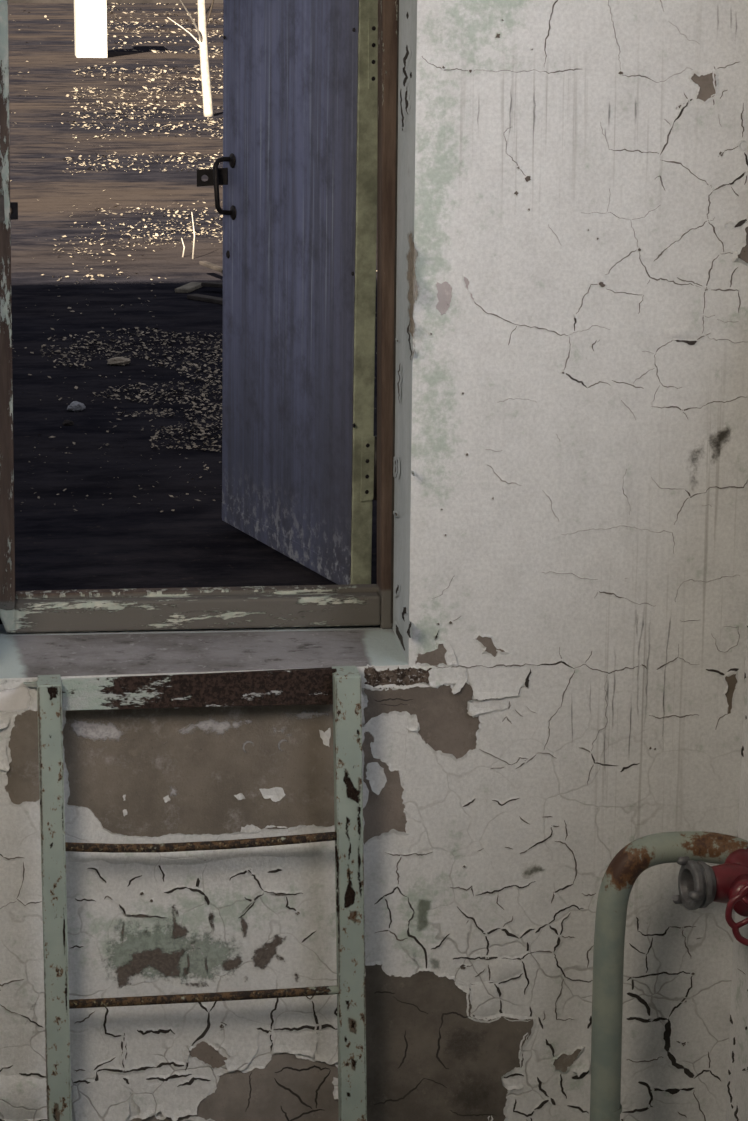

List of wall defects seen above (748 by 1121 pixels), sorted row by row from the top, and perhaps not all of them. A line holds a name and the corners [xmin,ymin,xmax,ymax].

crack [421,0,583,76]
crack [472,0,748,421]
peeling [0,707,40,807]
peeling [63,704,335,839]
peeling [361,581,527,846]
crack [373,570,748,1121]
peeling [115,905,208,988]
crack [74,865,317,944]
crack [73,1001,229,1111]
flaking render [72,1031,339,1121]
crack [257,996,337,1052]
flaking render [365,961,537,1121]